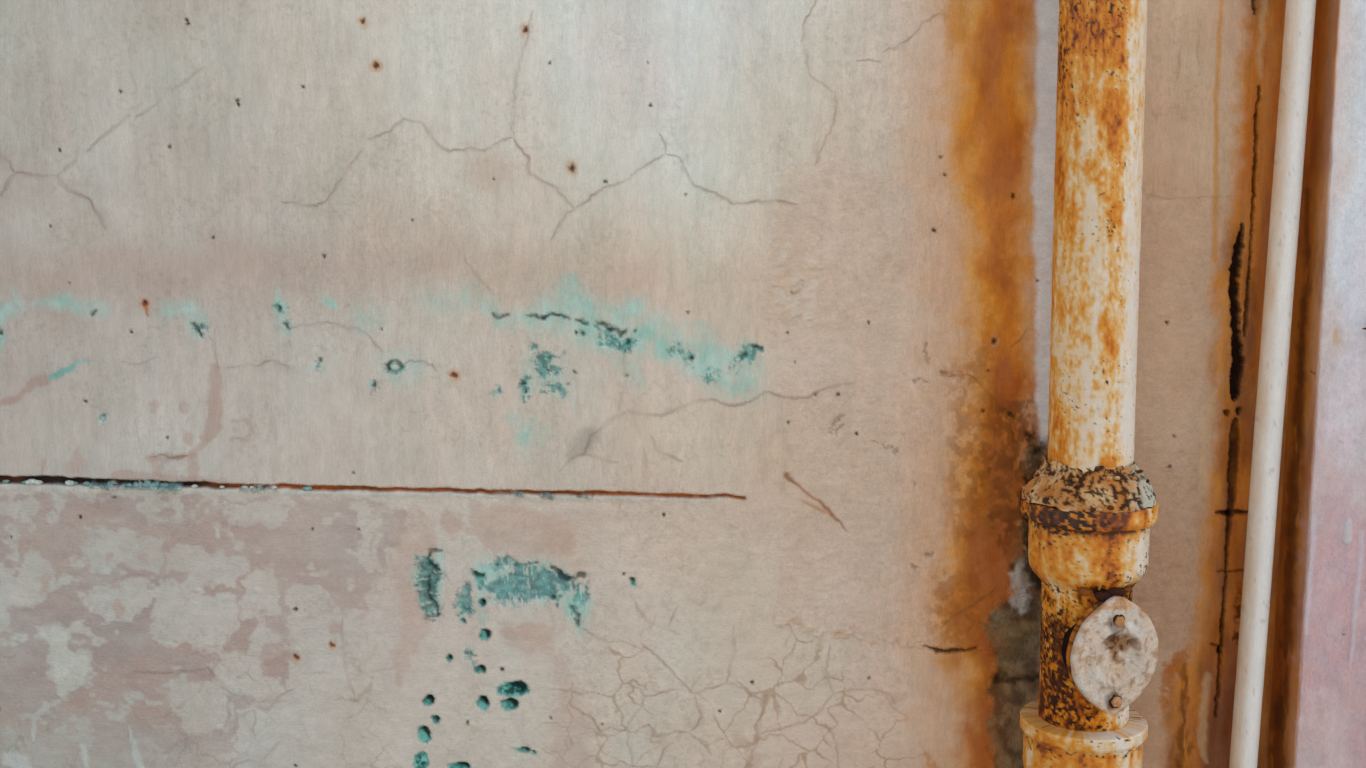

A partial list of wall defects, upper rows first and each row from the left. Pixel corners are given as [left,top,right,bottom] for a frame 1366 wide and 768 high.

crack [0,66,205,230]
crack [279,9,798,242]
peeling [0,281,114,371]
peeling [365,327,430,396]
crack [0,354,857,504]
peeling [476,269,772,467]
rust [869,0,1037,768]
peeling [32,618,99,698]
peeling [408,544,596,671]
crack [582,600,899,768]
leakage [976,410,1048,768]
rust [1077,586,1132,602]